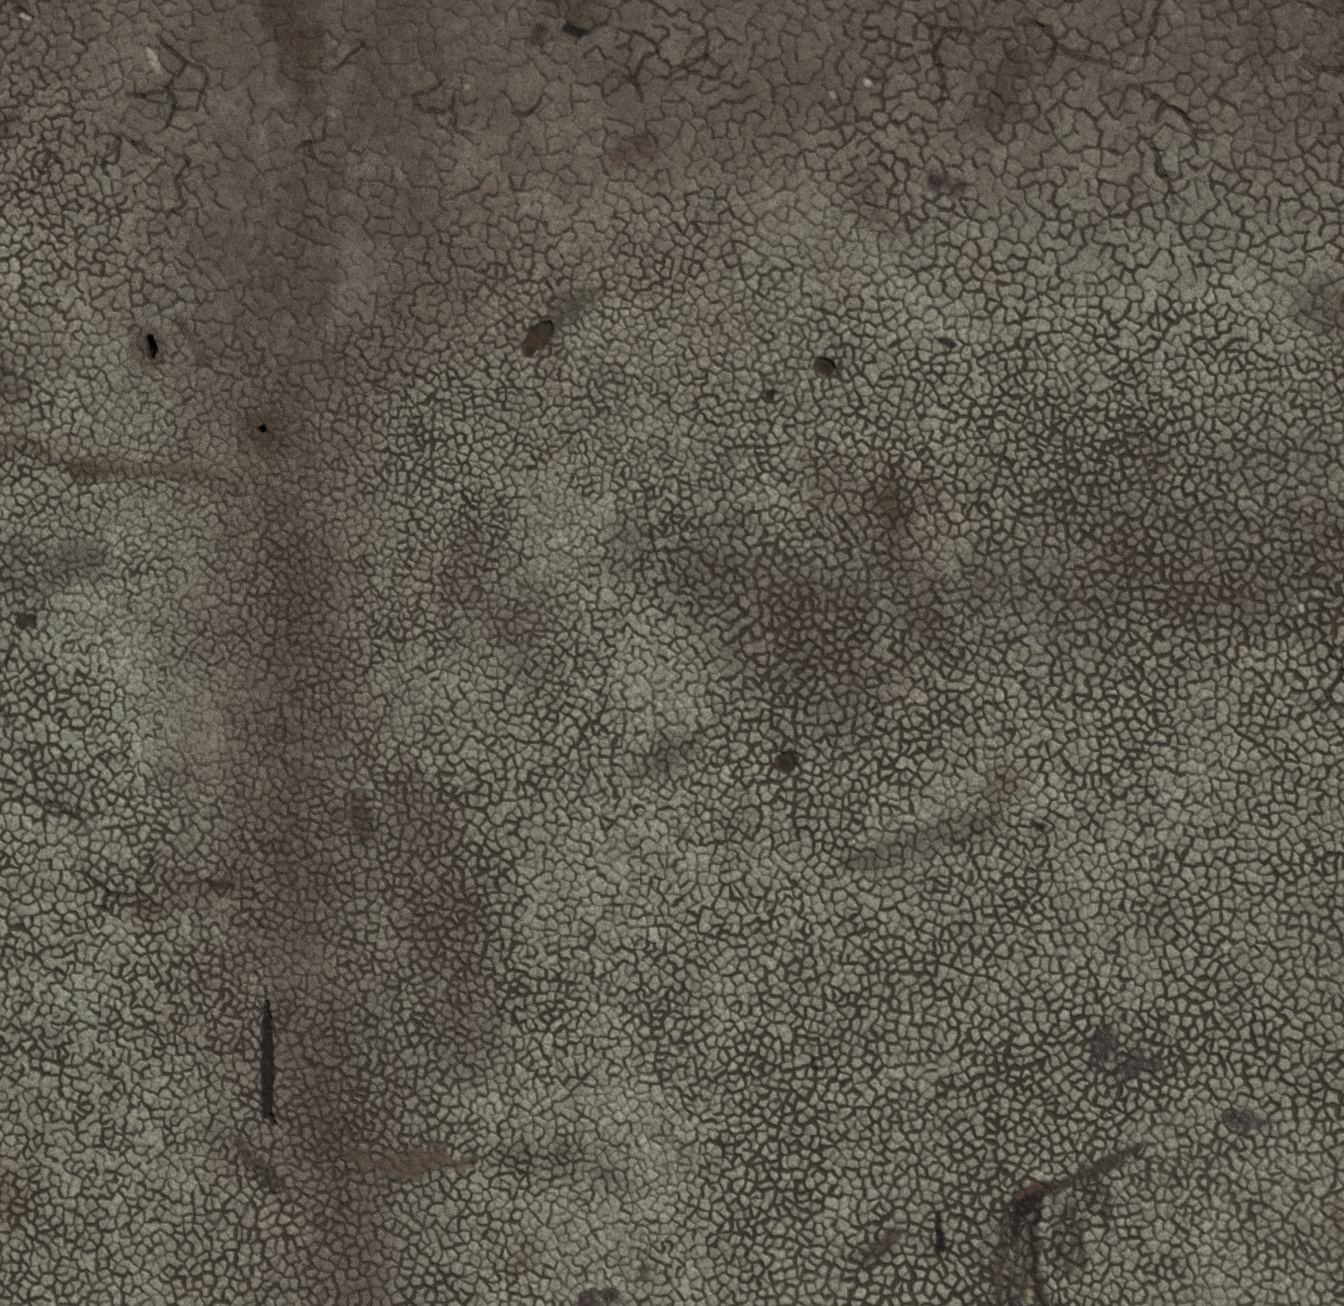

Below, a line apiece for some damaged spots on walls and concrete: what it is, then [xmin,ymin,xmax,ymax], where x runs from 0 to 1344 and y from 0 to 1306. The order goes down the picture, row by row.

crack [612,39,723,100]
crack [919,22,974,110]
crack [31,135,62,198]
crack [96,34,208,218]
crack [295,117,327,159]
crack [412,80,473,136]
crack [514,95,542,116]
crack [1024,0,1213,204]
crack [0,641,14,668]
crack [1313,641,1344,717]
crack [38,796,92,832]
crack [81,849,161,911]